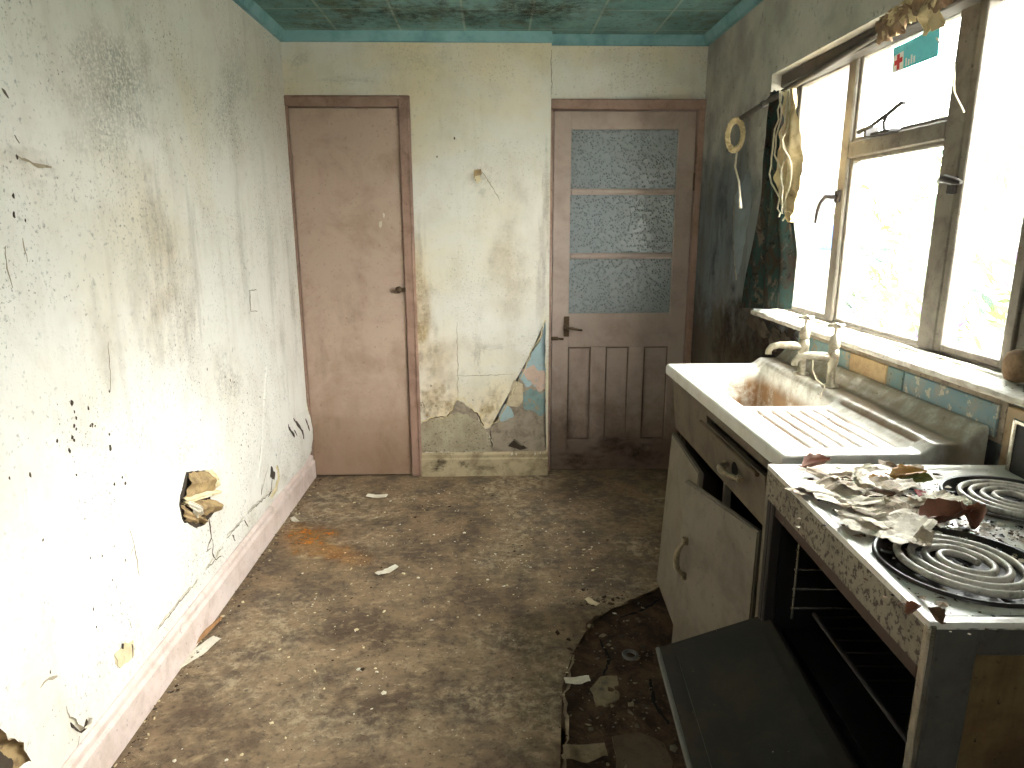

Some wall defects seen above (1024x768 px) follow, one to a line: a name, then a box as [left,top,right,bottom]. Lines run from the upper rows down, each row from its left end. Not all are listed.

flaking render [421,322,546,455]
hole [179,470,214,528]
crack [206,518,248,560]
flaking render [114,620,134,668]
spalling [0,751,13,768]